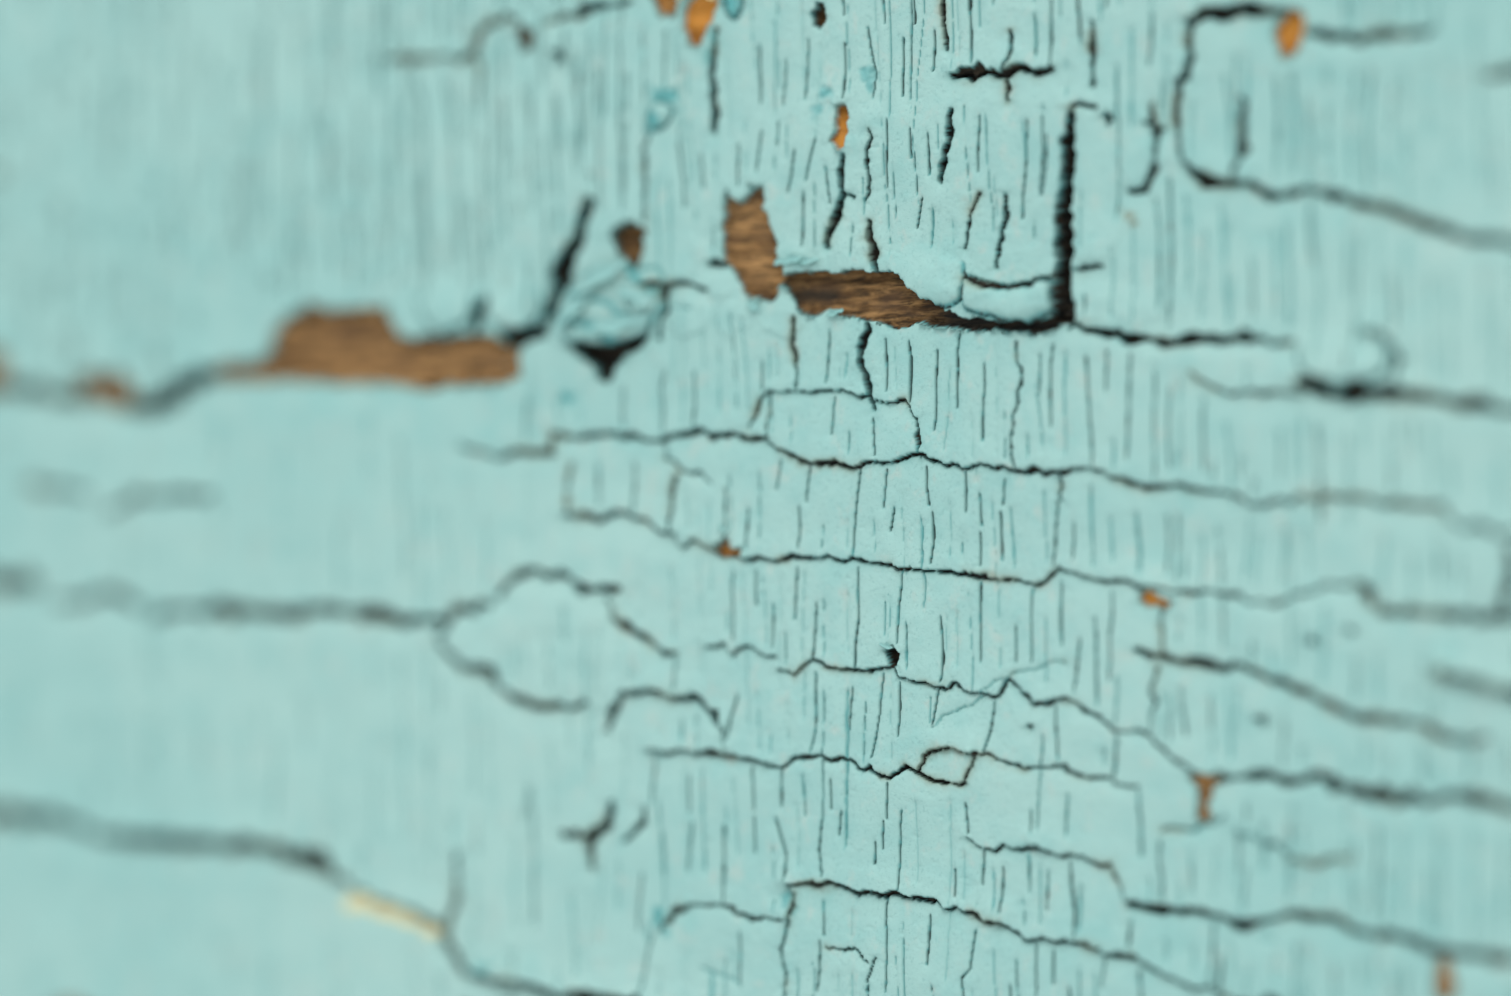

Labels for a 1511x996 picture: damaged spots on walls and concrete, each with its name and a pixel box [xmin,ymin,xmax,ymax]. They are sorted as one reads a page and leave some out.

peeling [206,301,525,394]
crack [379,0,632,111]
peeling [554,220,653,384]
peeling [648,0,719,48]
crack [469,0,1109,347]
peeling [718,103,1077,337]
peeling [1098,109,1115,128]
peeling [1271,5,1309,61]
crack [1126,0,1511,246]
crack [0,257,1511,996]